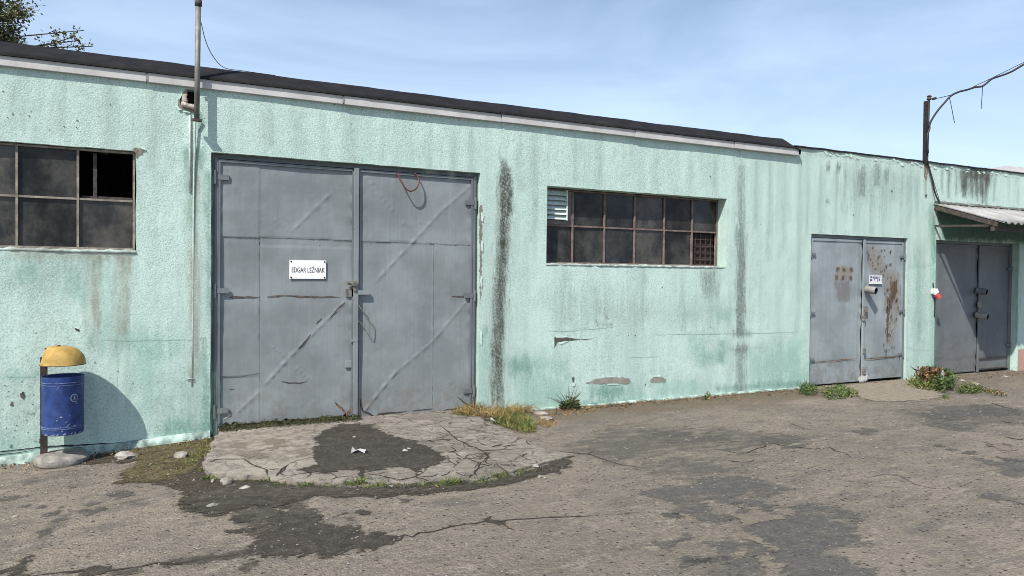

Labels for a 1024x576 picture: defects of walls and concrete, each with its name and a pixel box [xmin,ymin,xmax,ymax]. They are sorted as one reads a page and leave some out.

damp [948,170,995,199]
damp [491,164,511,401]
corrosion [867,246,900,357]
peeling [553,334,594,348]
spalling [571,376,631,387]
crack [244,426,533,481]
crack [394,512,636,541]